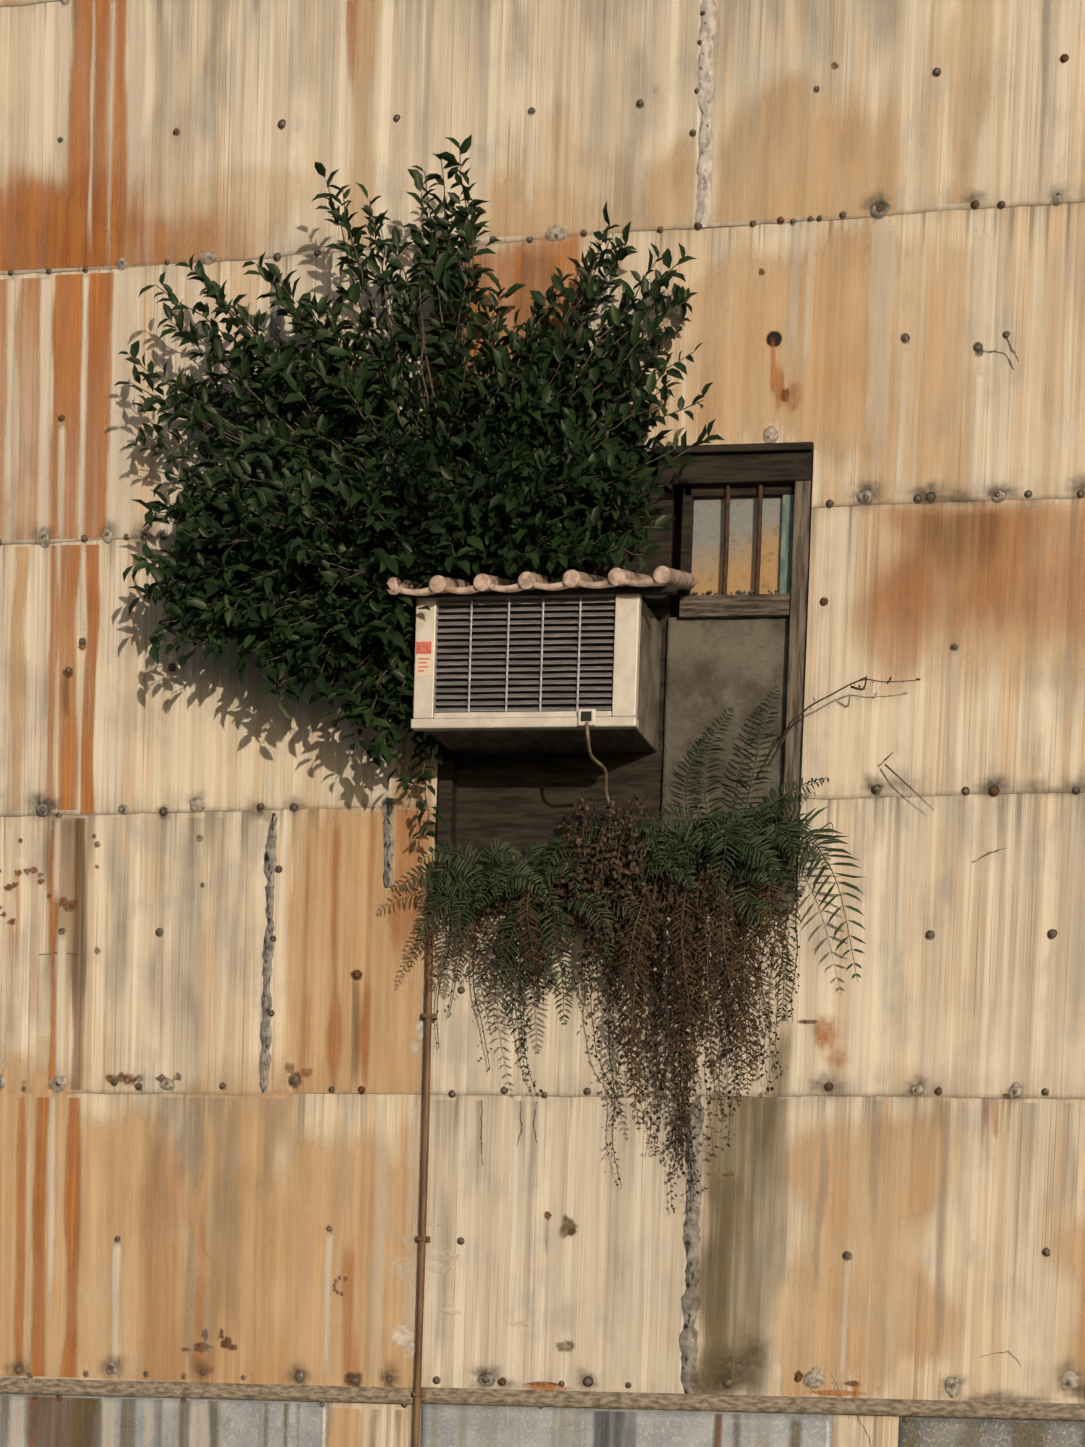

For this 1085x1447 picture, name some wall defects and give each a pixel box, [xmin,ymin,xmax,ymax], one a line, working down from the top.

rust [730,89,893,222]
rust [708,237,883,449]
rust [0,0,431,1388]
rust [30,1396,98,1447]